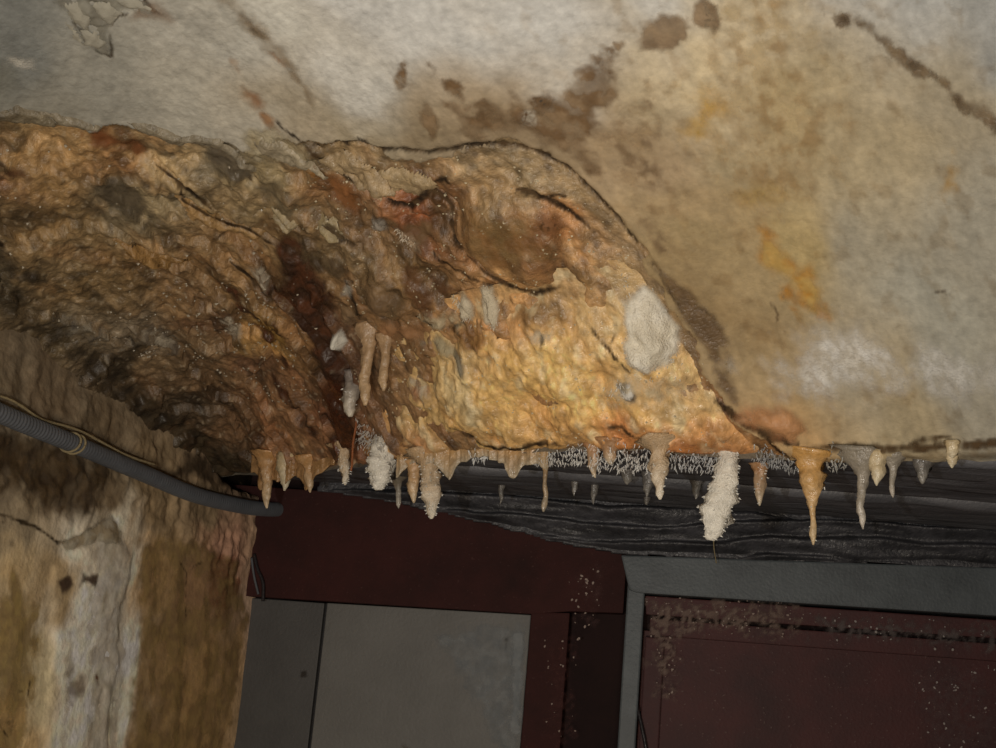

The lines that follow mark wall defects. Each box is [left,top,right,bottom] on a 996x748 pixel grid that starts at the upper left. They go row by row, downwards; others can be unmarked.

peeling [60,0,152,54]
leakage [466,43,623,152]
leakage [642,0,719,49]
leakage [876,37,996,133]
crack [277,123,637,241]
crack [388,177,555,296]
crack [346,284,358,316]
spalling [0,105,789,492]
leakage [274,237,759,463]
leakage [53,323,249,496]
corrosion [322,378,364,455]
leakage [59,537,131,748]